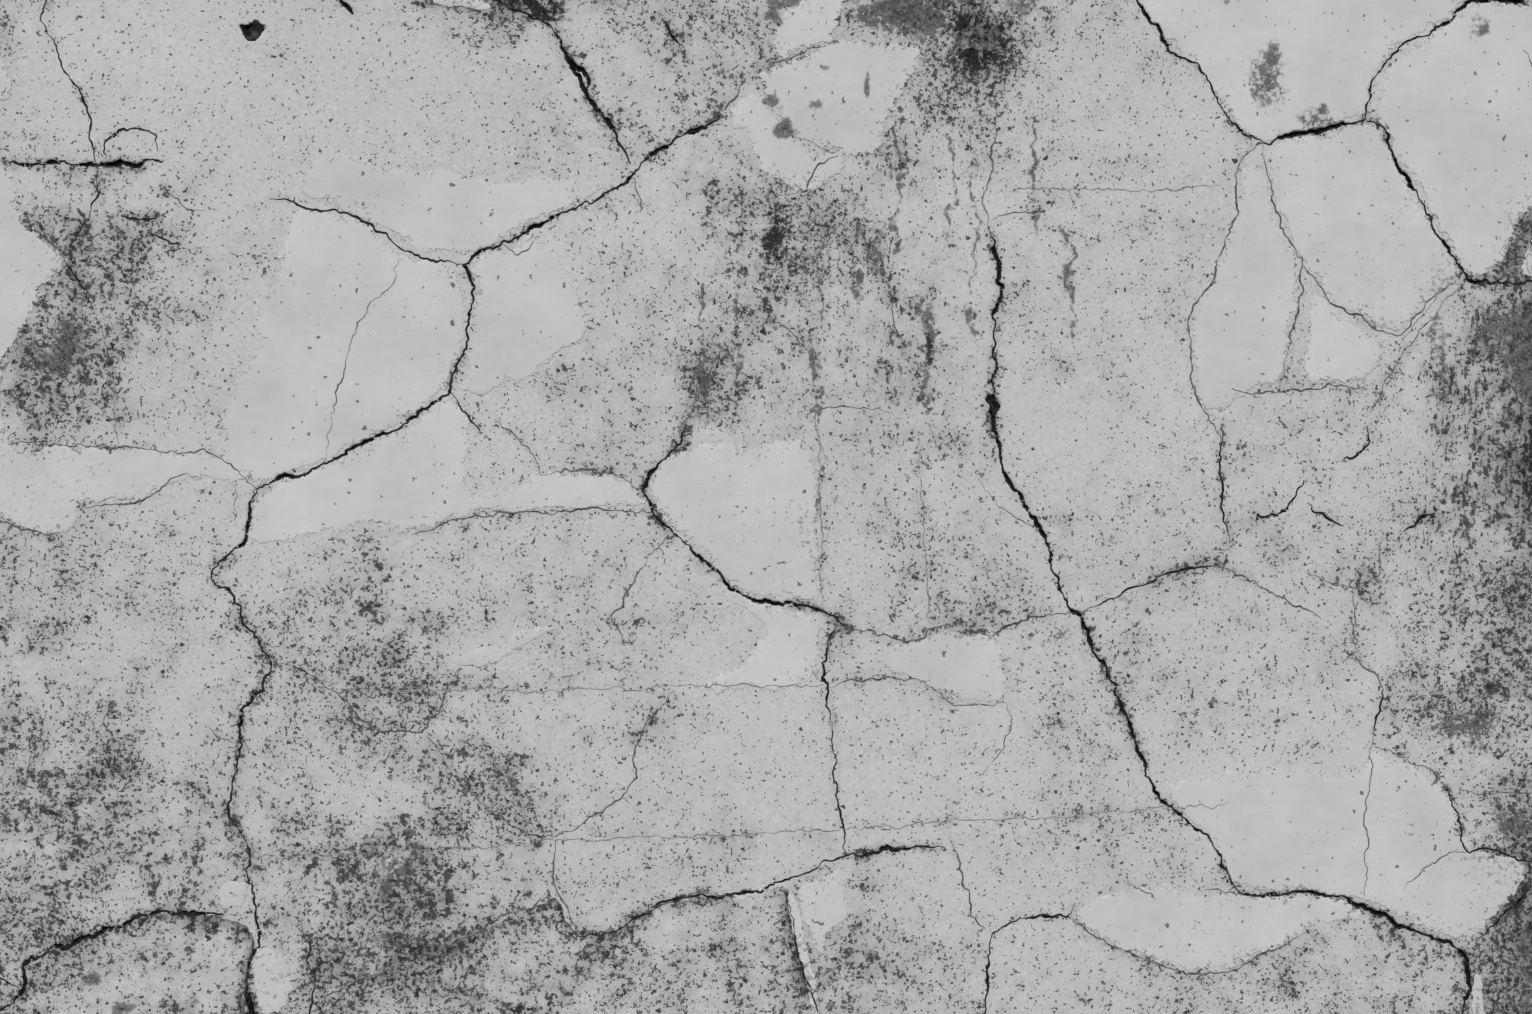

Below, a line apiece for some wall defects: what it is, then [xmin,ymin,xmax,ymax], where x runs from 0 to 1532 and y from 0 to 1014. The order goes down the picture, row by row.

leakage [848,0,1006,70]
crack [794,156,838,192]
crack [860,225,906,345]
crack [982,103,1037,396]
crack [1136,0,1532,542]
crack [0,0,742,1014]
crack [378,380,1532,1014]
peeling [81,971,101,984]
peeling [112,1003,136,1014]
peeling [218,881,247,908]
peeling [252,946,294,1014]
peeling [788,868,852,1014]